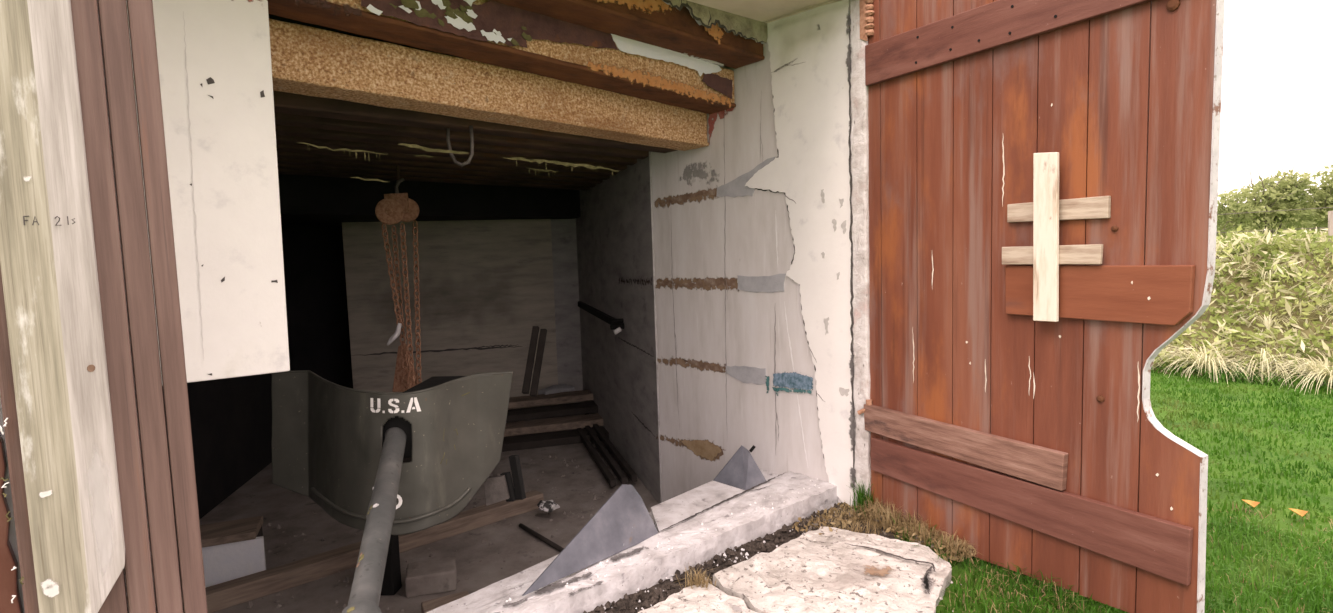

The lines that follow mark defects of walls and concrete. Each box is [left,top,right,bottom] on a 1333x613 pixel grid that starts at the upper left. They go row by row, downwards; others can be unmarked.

peeling [367,0,532,46]
spalling [662,0,768,44]
peeling [611,34,724,77]
spalling [654,157,775,208]
spalling [619,274,786,293]